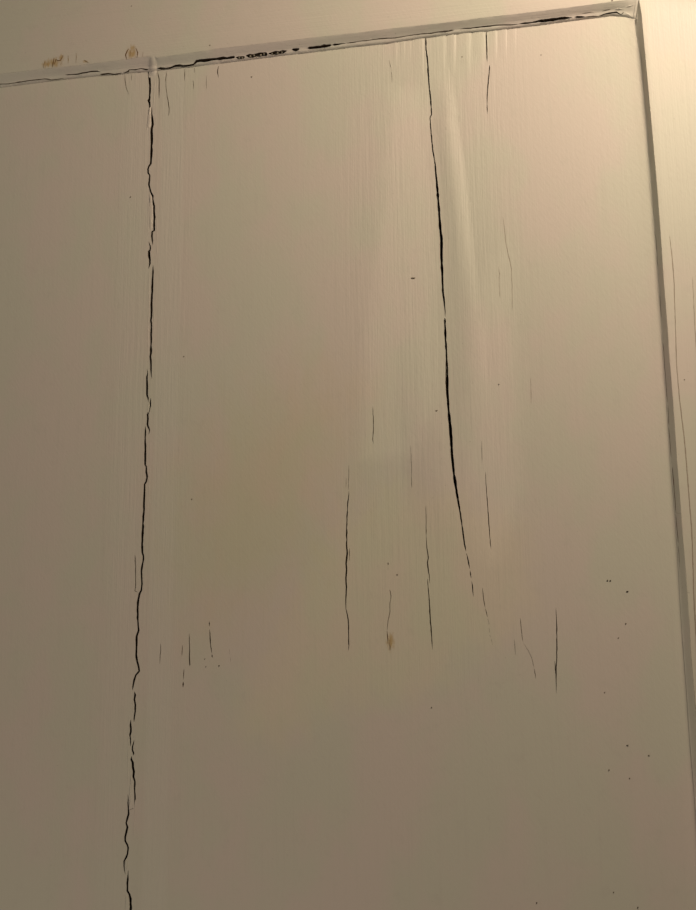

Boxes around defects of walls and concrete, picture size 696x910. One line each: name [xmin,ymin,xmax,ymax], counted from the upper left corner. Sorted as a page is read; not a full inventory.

crack [463,9,624,112]
crack [0,30,492,910]
crack [514,615,557,688]